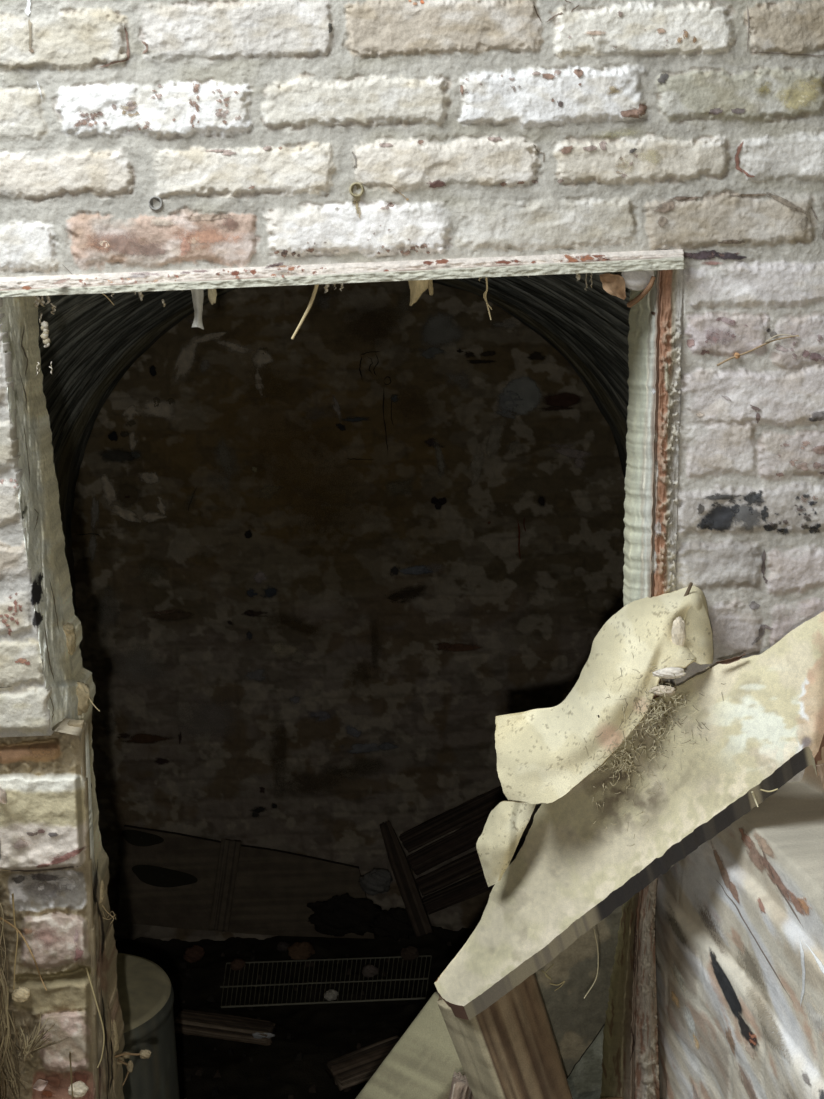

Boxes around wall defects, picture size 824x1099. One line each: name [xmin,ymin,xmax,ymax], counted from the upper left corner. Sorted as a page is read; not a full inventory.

peeling [697,490,789,534]
peeling [795,495,821,533]
spalling [710,951,756,1059]
peeling [740,1068,757,1099]